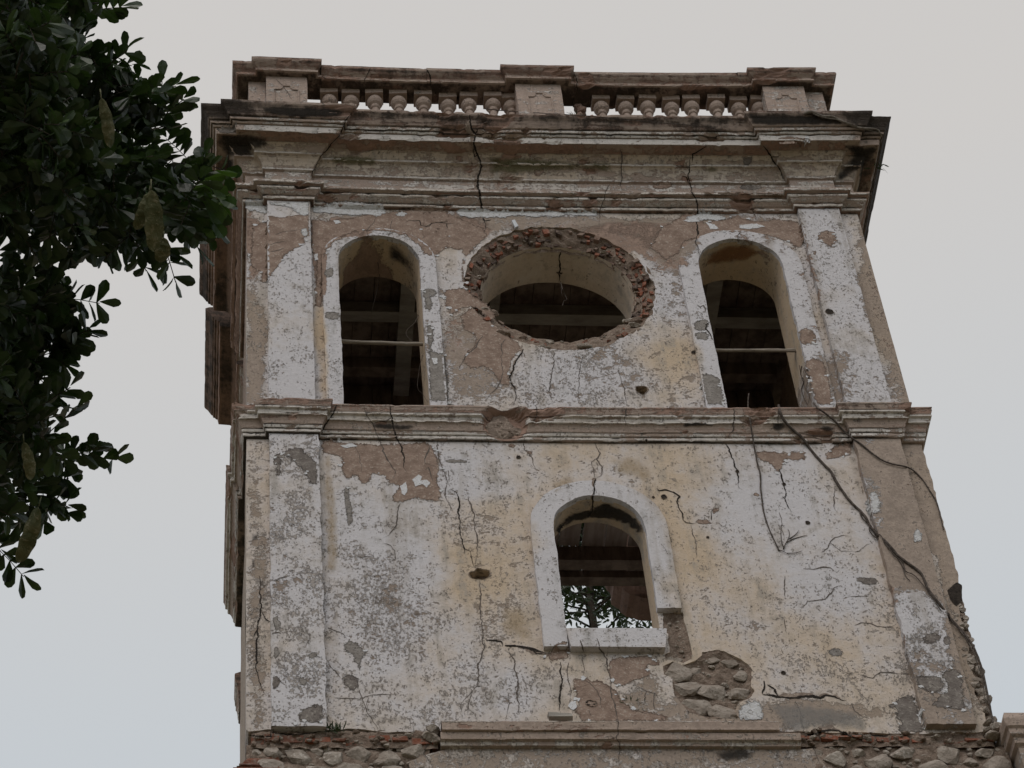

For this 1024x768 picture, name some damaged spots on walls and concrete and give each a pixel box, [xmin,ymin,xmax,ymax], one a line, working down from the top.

crack [465,115,489,231]
crack [683,147,705,255]
spalling [246,206,657,385]
peeling [273,437,467,525]
crack [459,336,555,469]
crack [658,489,712,556]
crack [726,409,739,487]
crack [254,576,286,692]
crack [348,404,658,762]
spalling [568,613,754,721]
crack [762,668,906,763]
spalling [889,582,1001,748]